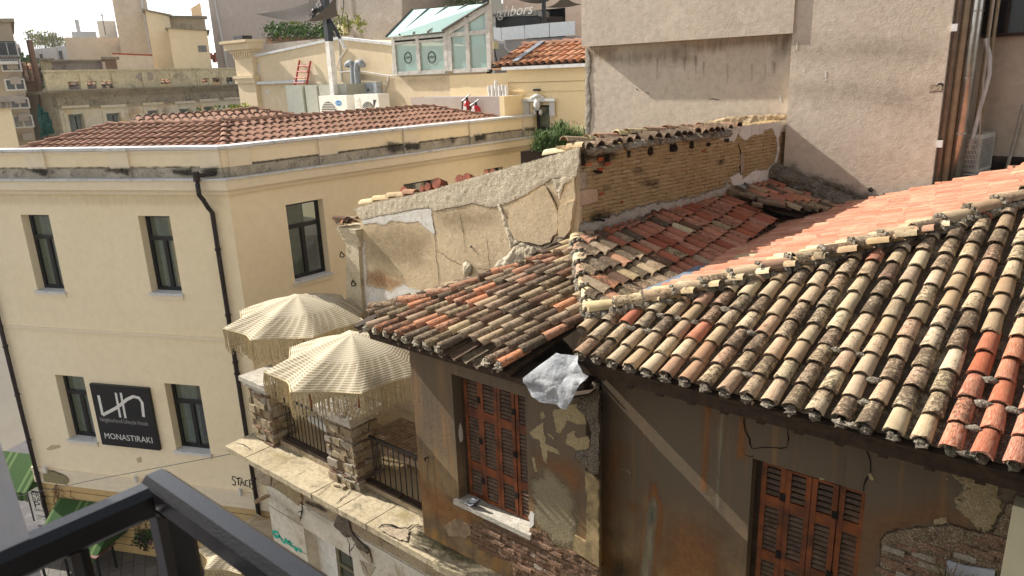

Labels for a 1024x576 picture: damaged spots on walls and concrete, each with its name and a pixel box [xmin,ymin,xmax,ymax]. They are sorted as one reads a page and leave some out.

damp [2,167,144,176]
damp [167,166,217,176]
damp [338,127,535,153]
peeling [712,120,786,186]
spalling [332,147,580,267]
crack [433,208,491,277]
crack [743,417,789,457]
spalling [444,380,601,576]
spalling [879,474,1017,576]